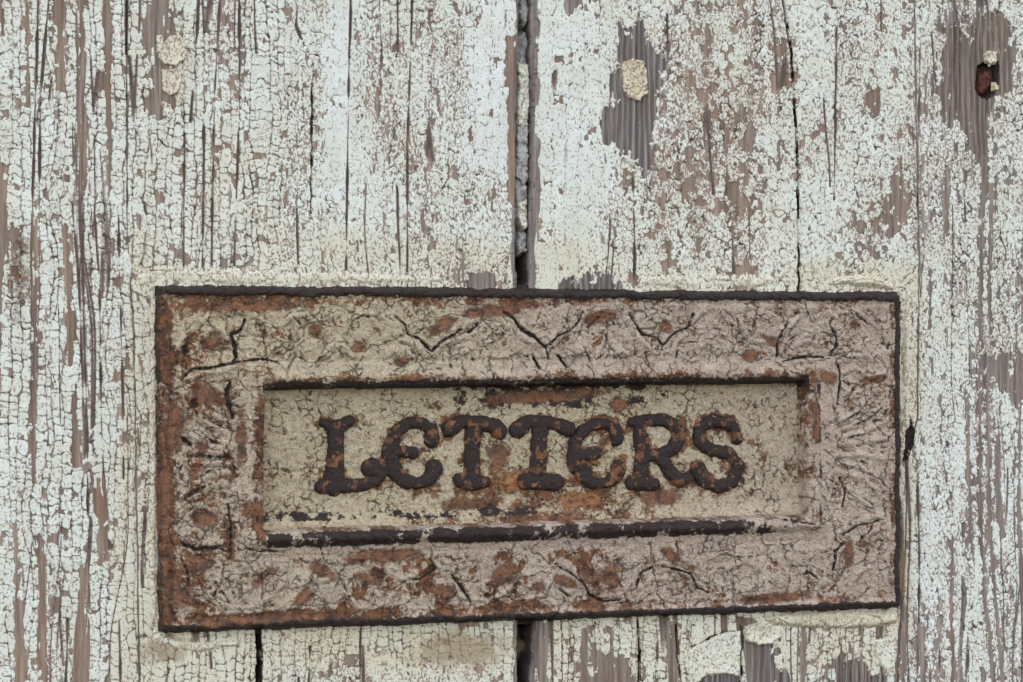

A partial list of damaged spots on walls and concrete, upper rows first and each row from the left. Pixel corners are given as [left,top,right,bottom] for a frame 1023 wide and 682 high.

peeling [53,0,115,198]
peeling [600,15,673,204]
crack [786,14,799,220]
peeling [27,195,42,489]
rust [427,303,531,338]
crack [794,246,802,290]
peeling [932,5,1023,682]
peeling [9,523,52,682]
rust [155,462,176,559]
rust [235,408,248,467]
crack [255,633,263,682]
rust [343,548,420,585]